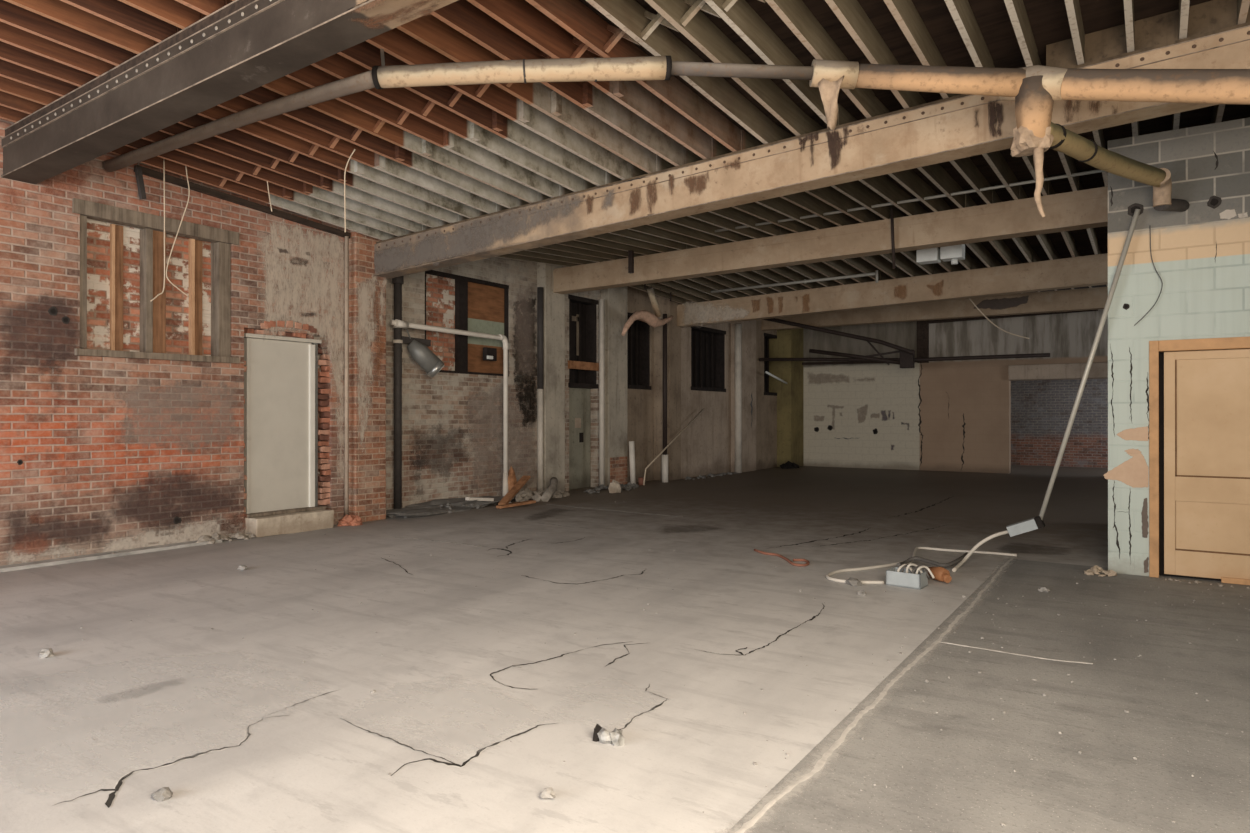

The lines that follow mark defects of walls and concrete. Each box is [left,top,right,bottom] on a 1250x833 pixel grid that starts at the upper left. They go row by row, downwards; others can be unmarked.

peeling [244,223,387,505]
water stain [7,473,245,564]
peeling [1103,426,1148,538]
crack [50,690,557,808]
crack [489,642,643,690]
crack [619,684,669,730]
crack [695,604,825,656]